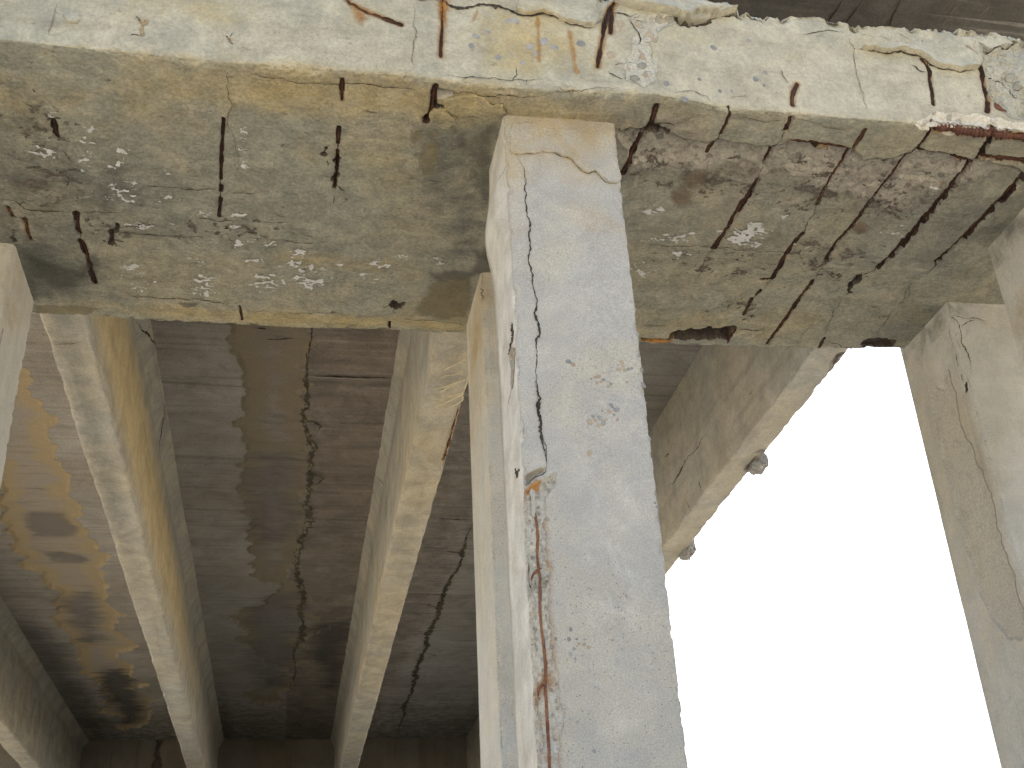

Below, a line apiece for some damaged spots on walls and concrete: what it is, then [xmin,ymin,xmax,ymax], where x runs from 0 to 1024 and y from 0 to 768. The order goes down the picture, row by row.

efflorescence [77,126,97,172]
efflorescence [105,179,138,203]
efflorescence [229,213,277,248]
spalling [422,38,1024,388]
efflorescence [188,257,217,302]
leakage [245,249,343,293]
leakage [359,254,408,283]
crack [496,152,607,466]
crack [113,293,459,690]
leakage [28,513,75,536]
crack [398,515,473,733]
spalling [514,467,580,768]